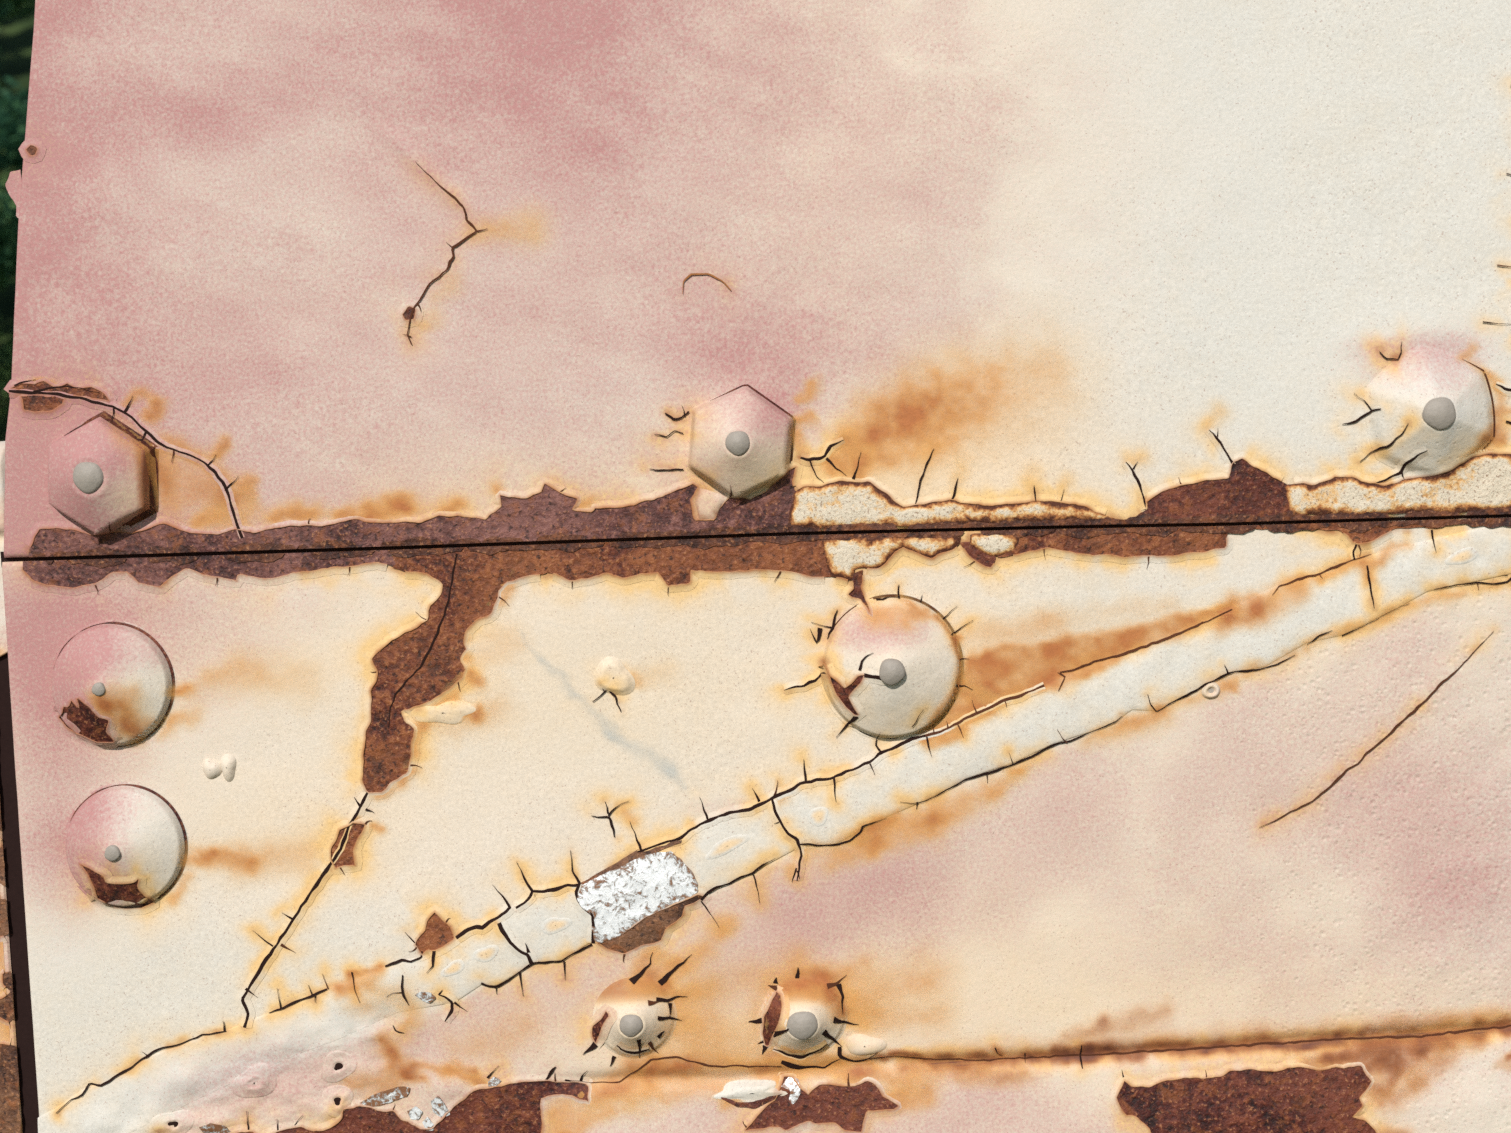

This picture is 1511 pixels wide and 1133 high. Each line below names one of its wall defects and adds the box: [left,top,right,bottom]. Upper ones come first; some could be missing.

crack [403,172,486,345]
crack [9,379,245,538]
crack [1344,393,1429,483]
rust [4,360,1511,800]
crack [592,530,1511,927]
rust [0,819,21,1133]
rust [69,784,265,916]
crack [56,792,596,1113]
rust [408,905,460,961]
rust [592,888,712,996]
rust [227,963,1511,1133]
crack [545,952,1511,1083]